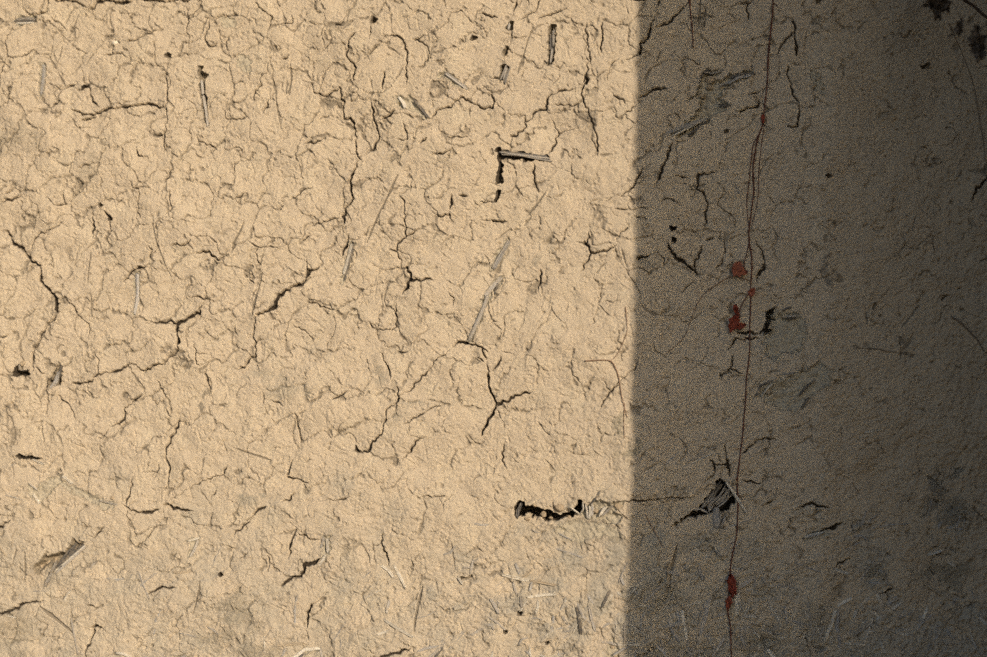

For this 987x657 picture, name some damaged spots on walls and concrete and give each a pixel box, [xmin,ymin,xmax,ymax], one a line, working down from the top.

crack [23,0,293,54]
crack [777,16,800,128]
crack [51,69,190,239]
crack [224,0,689,370]
crack [579,140,726,293]
crack [7,194,227,549]
crack [358,195,530,469]
crack [235,401,319,587]
crack [599,437,775,529]
crack [0,601,46,614]
crack [85,605,102,654]
crack [380,649,410,657]